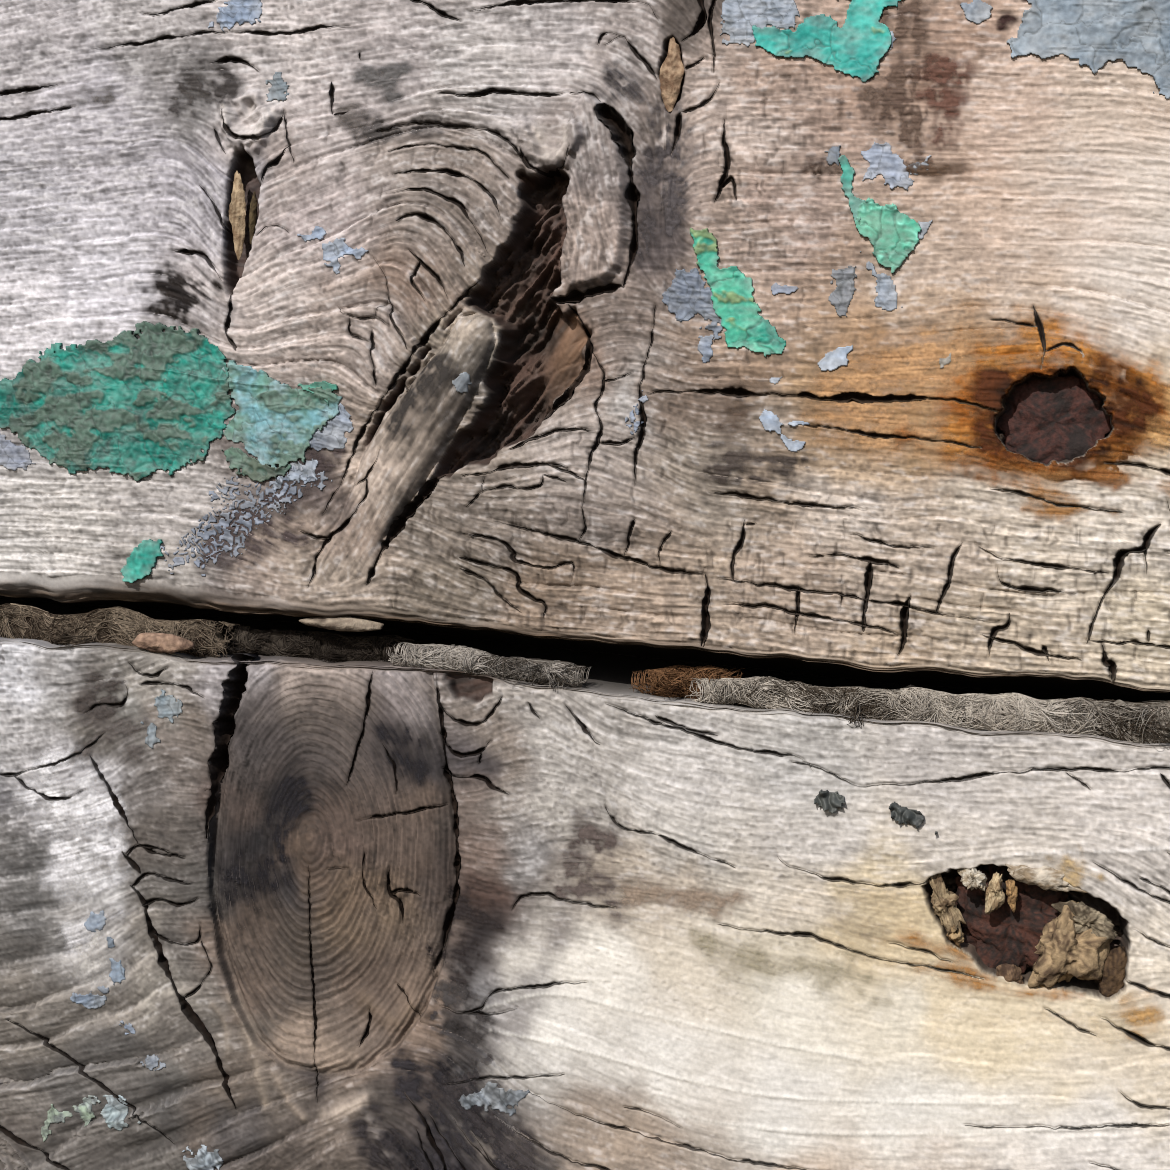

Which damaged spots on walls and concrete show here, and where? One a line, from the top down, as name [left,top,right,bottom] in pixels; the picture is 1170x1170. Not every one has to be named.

peeling [720,0,901,82]
peeling [1007,0,1170,99]
peeling [0,321,354,583]
crack [301,121,569,587]
peeling [662,228,786,363]
crack [366,88,1170,681]
peeling [825,142,932,317]
rust [809,310,1170,489]
rust [1021,490,1083,518]
crack [0,653,258,1109]
crack [347,672,508,976]
crack [605,703,1170,789]